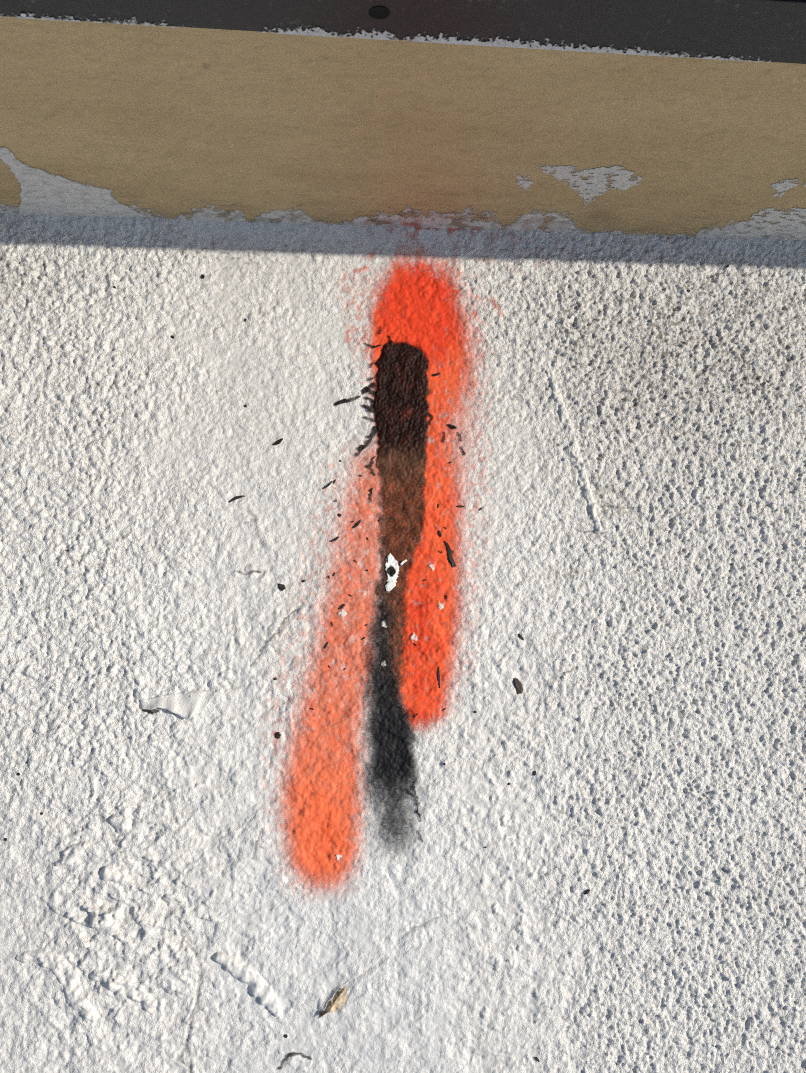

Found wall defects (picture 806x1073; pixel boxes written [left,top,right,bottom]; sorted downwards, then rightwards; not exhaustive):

peeling [0,147,806,241]